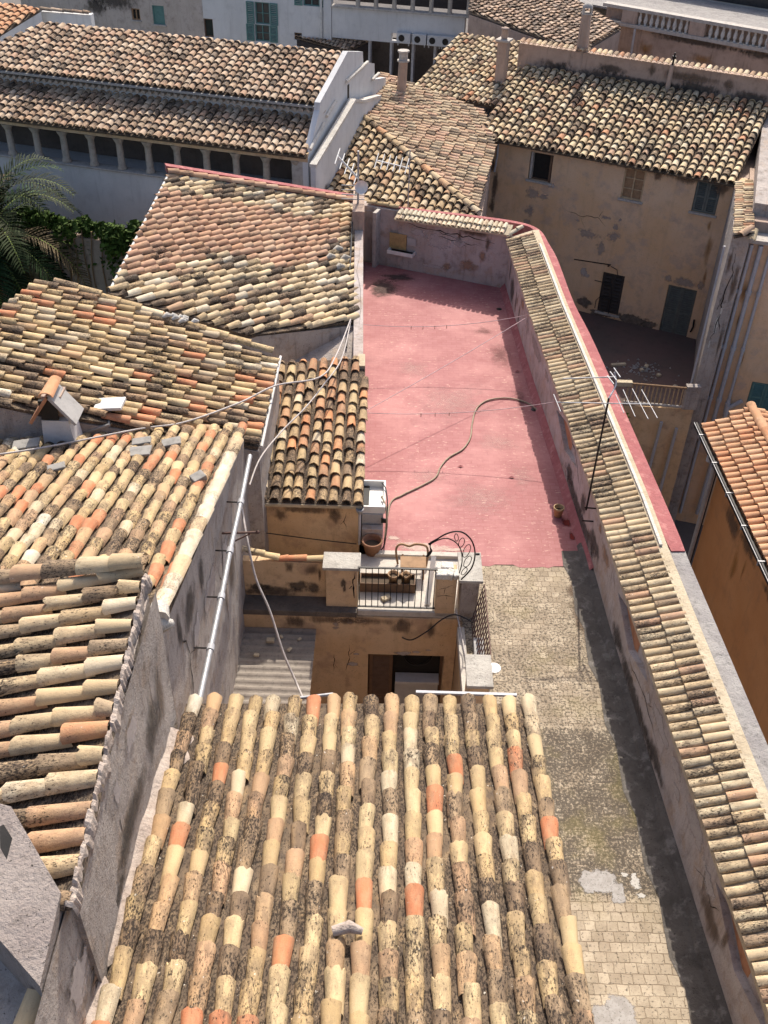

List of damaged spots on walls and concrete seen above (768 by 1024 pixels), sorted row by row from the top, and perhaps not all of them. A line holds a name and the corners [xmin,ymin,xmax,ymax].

leakage [373,275,410,296]
crack [710,254,736,338]
peeling [611,872,646,904]